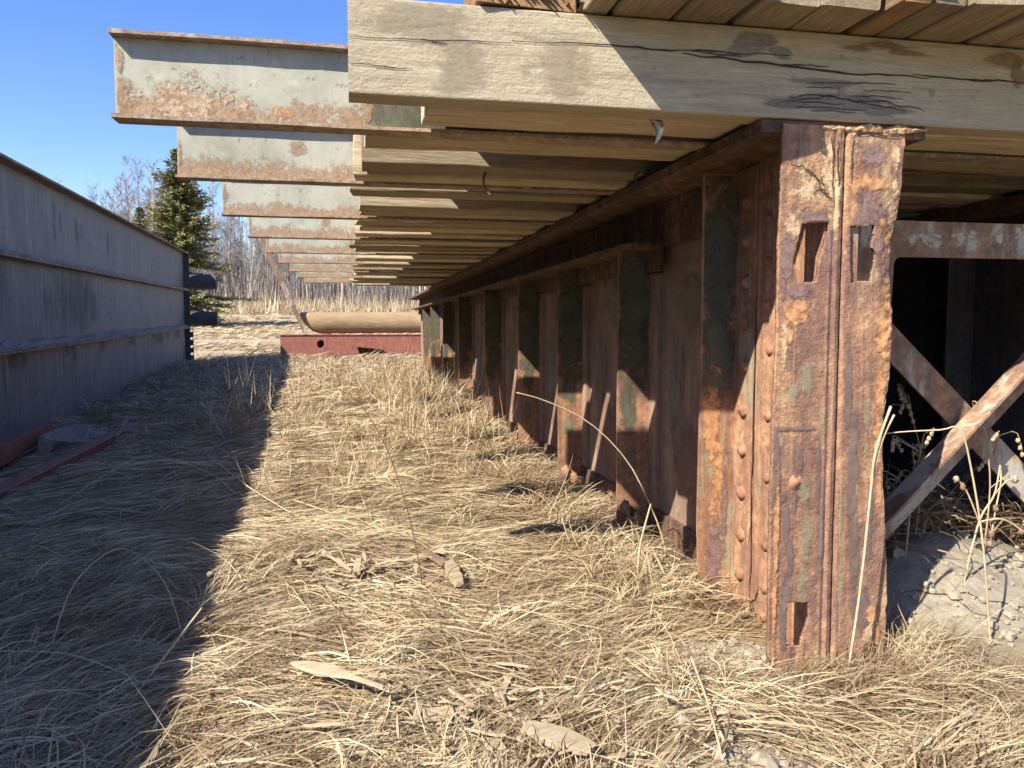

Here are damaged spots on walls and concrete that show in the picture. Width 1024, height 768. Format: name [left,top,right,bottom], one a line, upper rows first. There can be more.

corrosion [115,46,131,112]
corrosion [178,140,377,282]
corrosion [271,100,376,126]
crack [349,36,1024,210]
corrosion [783,135,996,244]
corrosion [509,378,518,419]
corrosion [599,342,616,480]
corrosion [675,364,728,594]
corrosion [779,298,810,372]
corrosion [873,279,892,507]